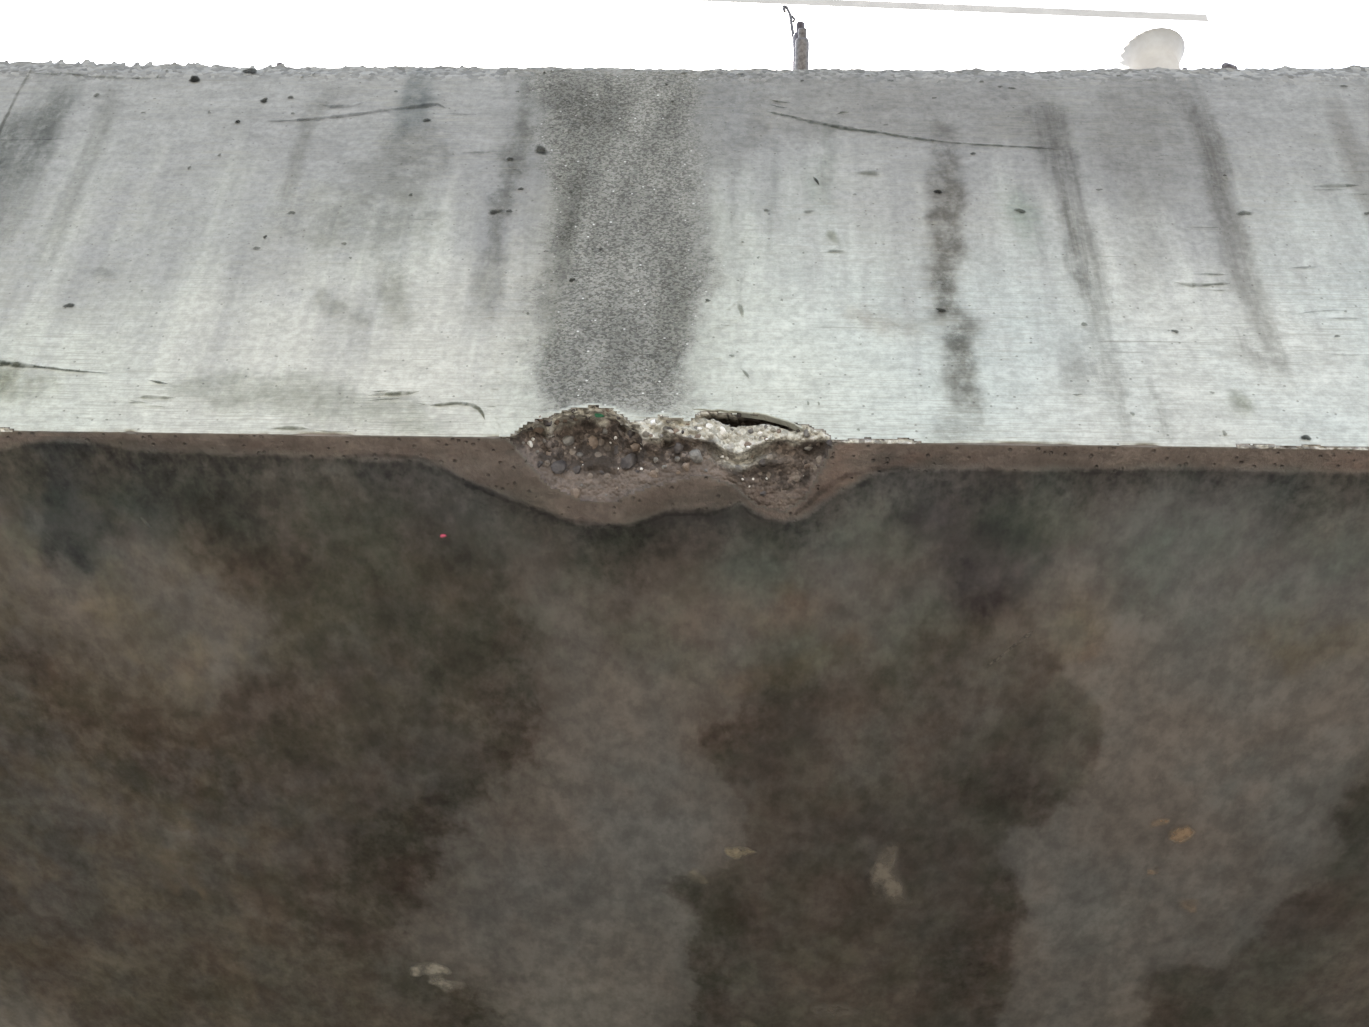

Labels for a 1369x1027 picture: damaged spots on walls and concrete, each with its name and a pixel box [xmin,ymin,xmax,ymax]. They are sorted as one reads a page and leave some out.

crack [1,361,101,373]
spalling [488,69,921,511]